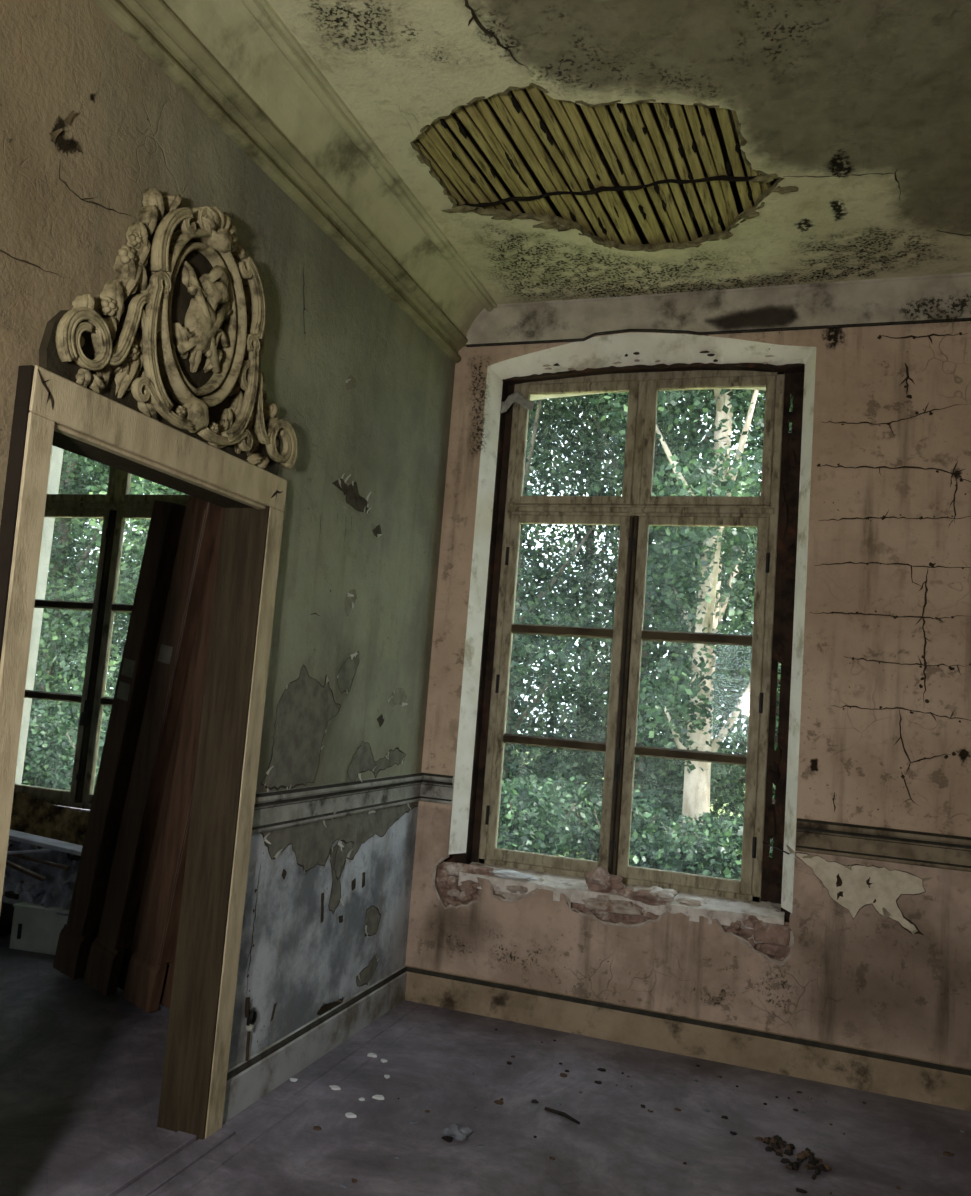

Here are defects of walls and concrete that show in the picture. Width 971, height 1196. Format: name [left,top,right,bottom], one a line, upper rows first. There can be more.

leakage [310,0,386,49]
leakage [479,0,971,299]
leakage [707,306,797,331]
leakage [901,294,971,322]
crack [823,332,968,435]
peeling [332,474,371,514]
crack [817,462,971,528]
crack [810,561,971,804]
peeling [261,802,418,923]
spalling [433,854,538,909]
peeling [786,845,932,936]
spalling [715,915,794,965]